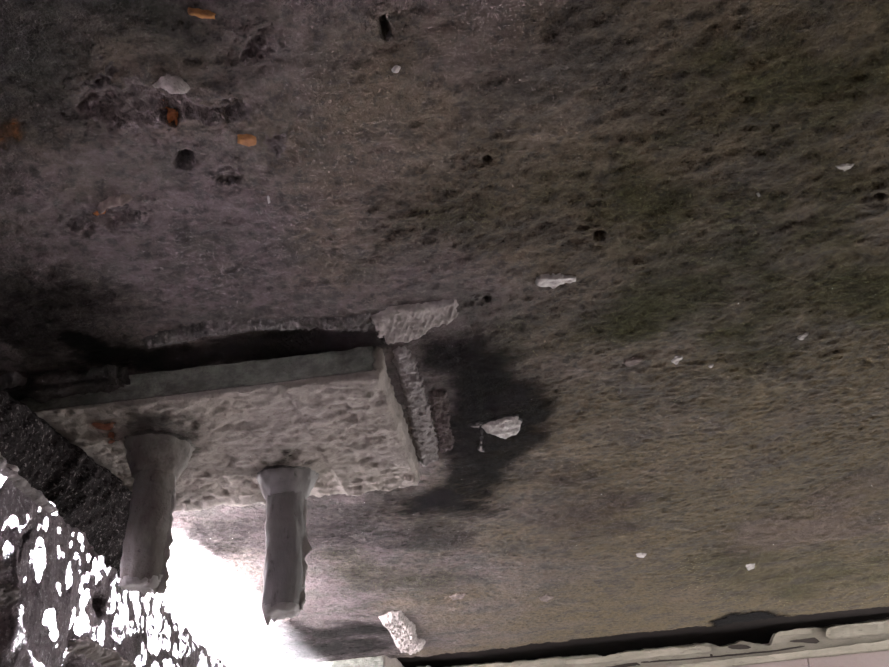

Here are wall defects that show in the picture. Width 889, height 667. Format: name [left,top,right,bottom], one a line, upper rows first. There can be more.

spalling [59,48,264,147]
spalling [204,152,255,198]
spalling [53,192,154,241]